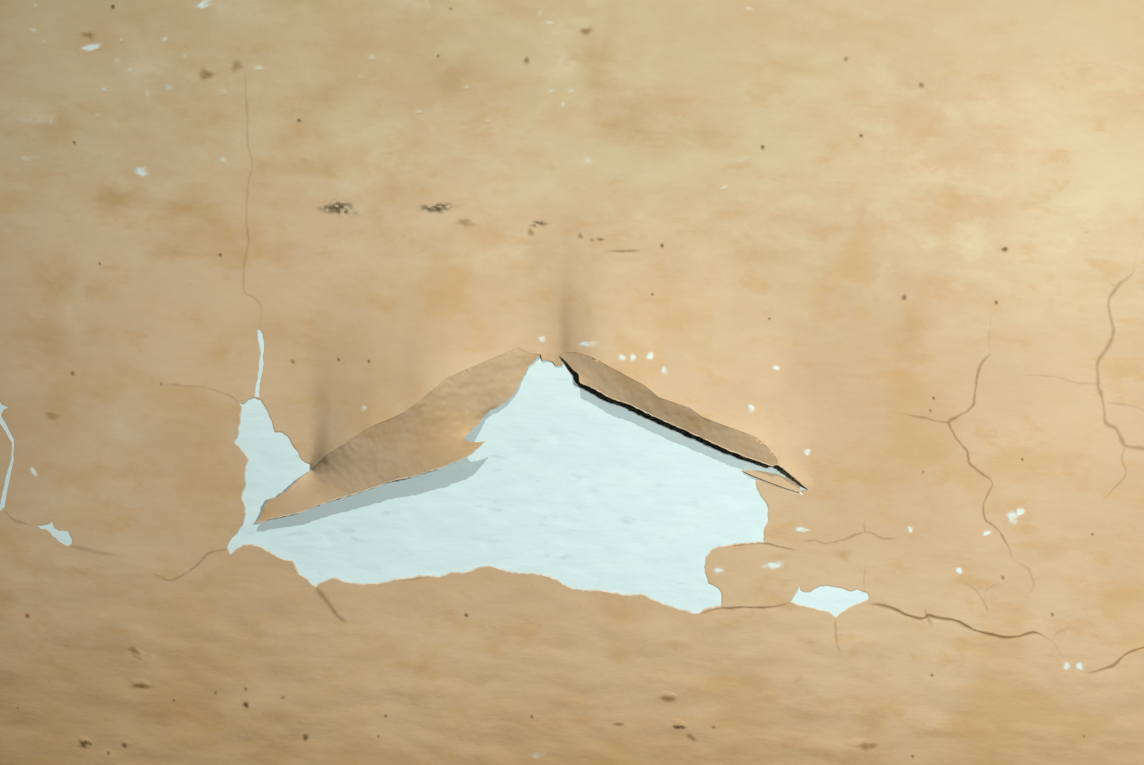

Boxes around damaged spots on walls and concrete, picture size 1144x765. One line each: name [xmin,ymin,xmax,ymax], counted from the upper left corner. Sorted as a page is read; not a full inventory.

peeling [227,335,808,614]
peeling [38,520,73,546]
peeling [790,585,869,618]